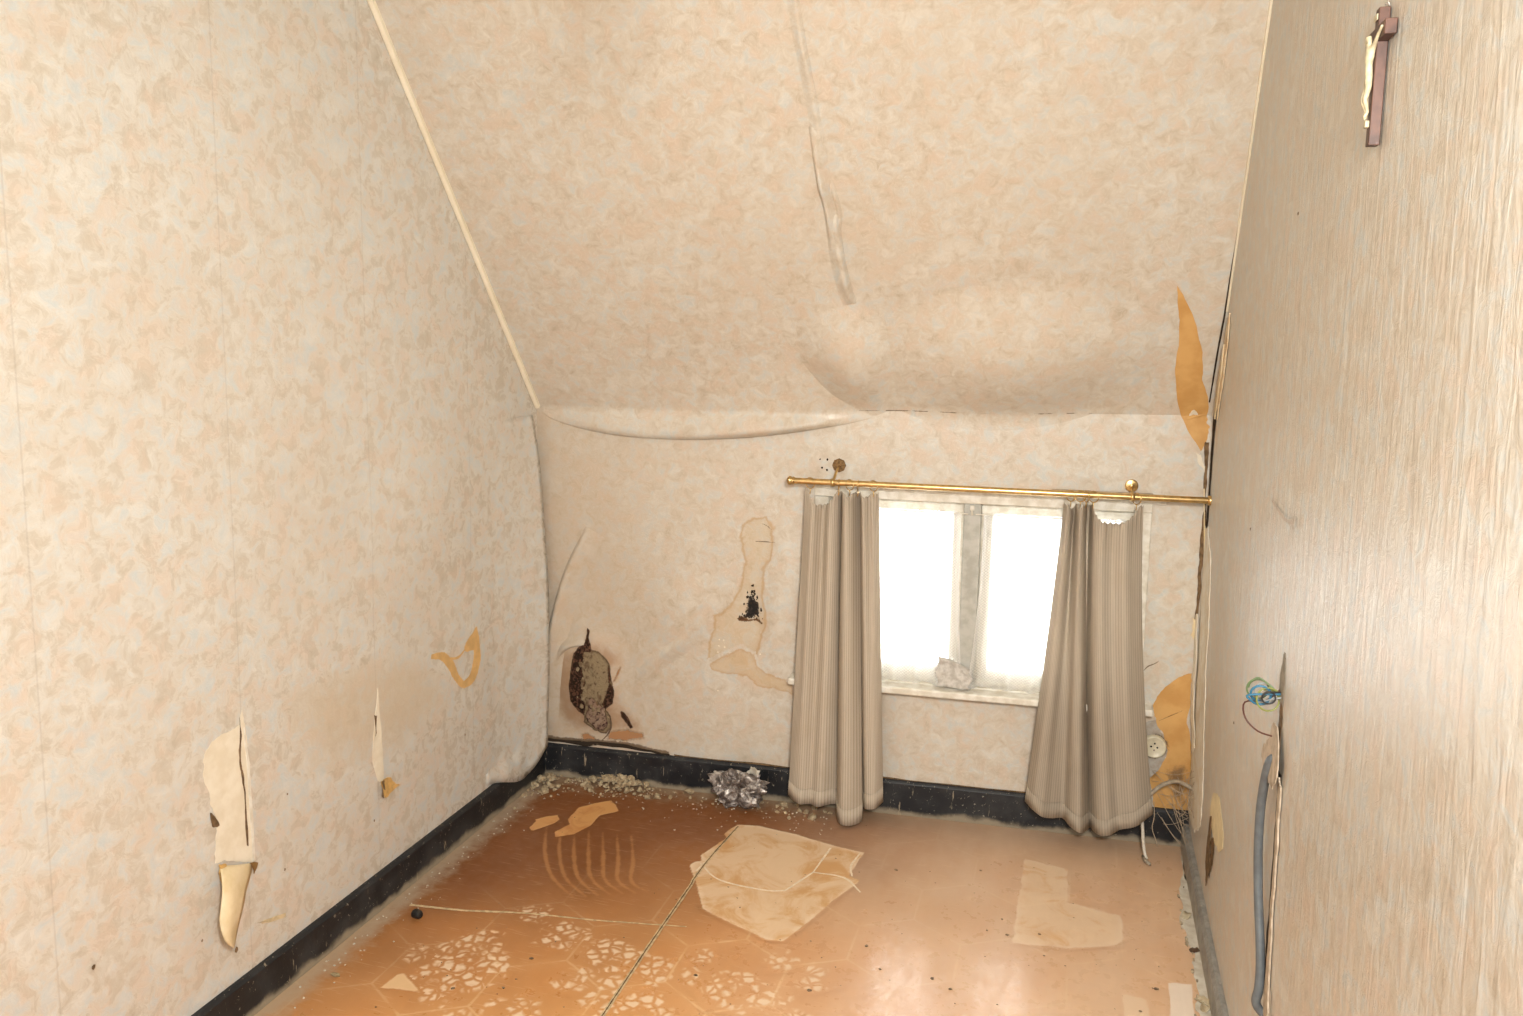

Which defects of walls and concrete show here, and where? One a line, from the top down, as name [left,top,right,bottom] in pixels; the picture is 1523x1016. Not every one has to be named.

peeling [1175,286,1211,472]
peeling [381,777,400,798]
spalling [555,626,657,744]
peeling [1146,673,1192,810]
peeling [1205,793,1224,886]